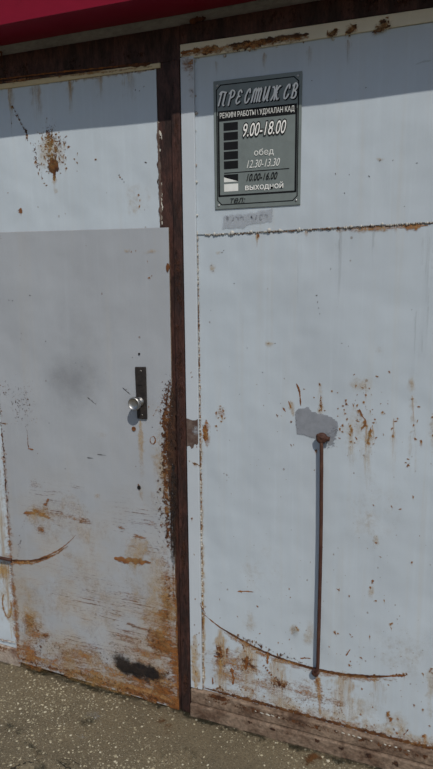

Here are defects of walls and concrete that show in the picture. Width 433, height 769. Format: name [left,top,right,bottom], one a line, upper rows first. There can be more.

corrosion [34,118,78,186]
corrosion [350,223,433,231]
corrosion [191,312,225,466]
corrosion [337,385,398,451]
corrosion [0,412,433,750]